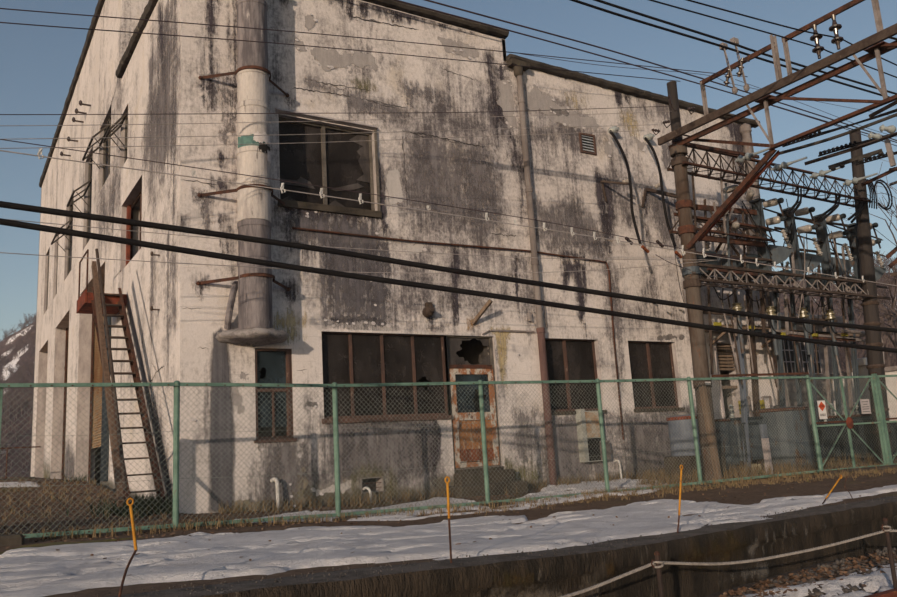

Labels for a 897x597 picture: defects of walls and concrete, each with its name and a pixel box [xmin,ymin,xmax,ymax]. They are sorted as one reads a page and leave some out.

damp [142,0,181,184]
damp [201,0,237,168]
peeling [294,37,383,74]
peeling [437,36,479,59]
peeling [496,61,603,131]
damp [166,235,177,357]
damp [192,177,230,230]
damp [280,164,397,329]
damp [426,247,460,331]
damp [403,137,496,230]
damp [485,52,625,385]
damp [209,328,235,513]